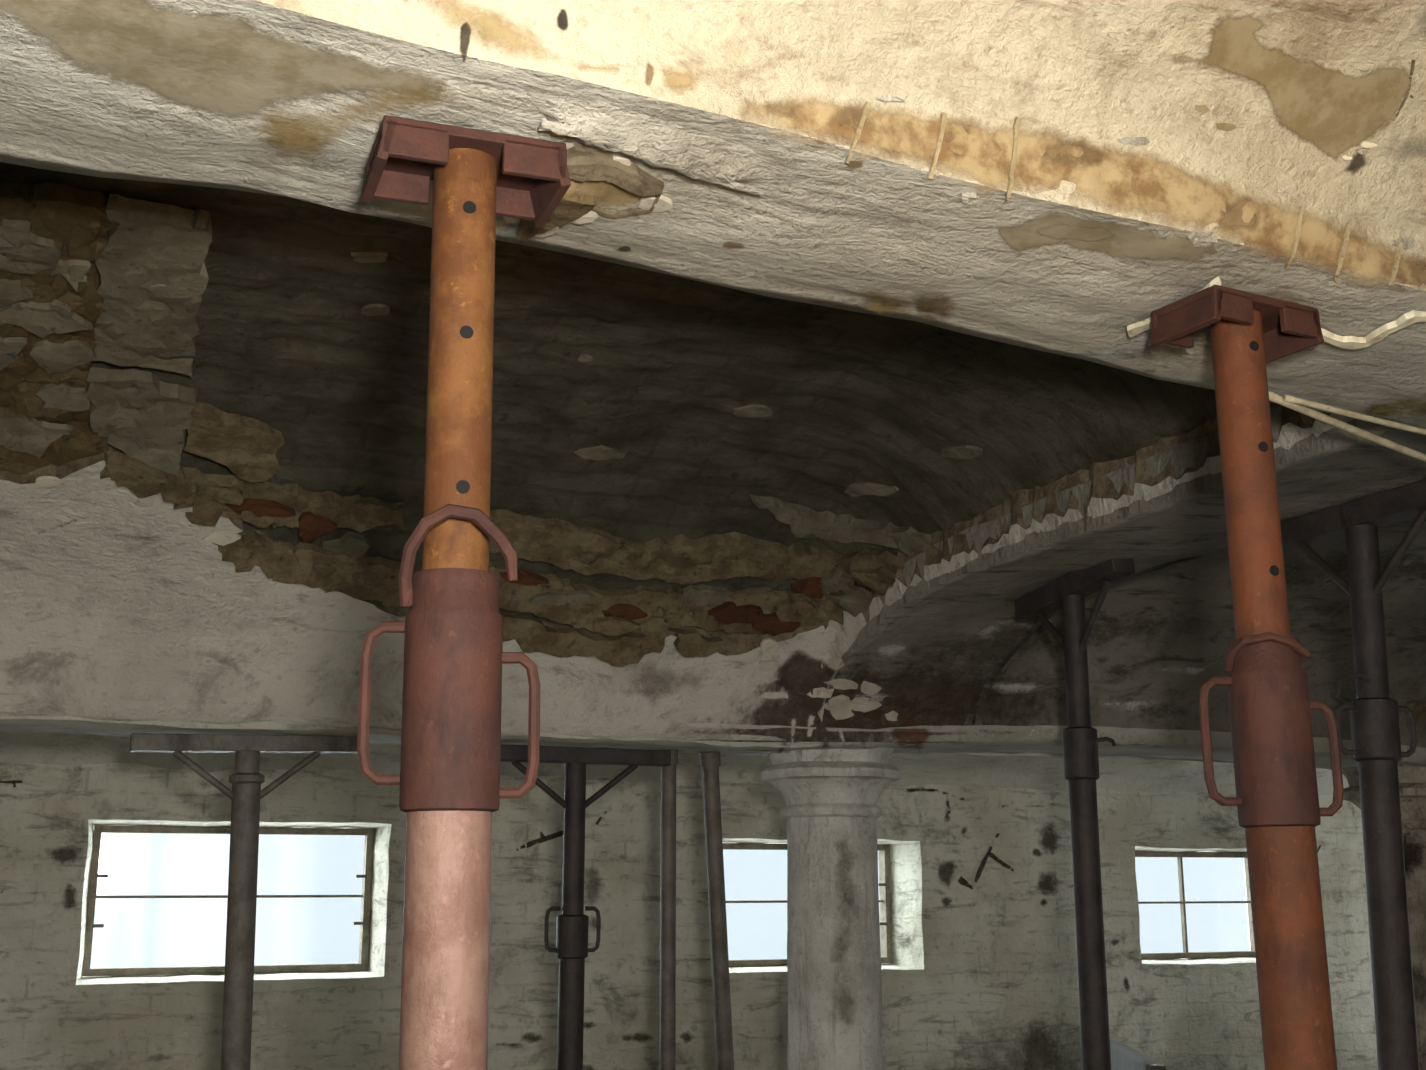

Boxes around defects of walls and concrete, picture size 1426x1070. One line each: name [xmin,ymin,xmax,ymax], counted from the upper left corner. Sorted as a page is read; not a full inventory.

water stain [269,115,332,149]
flaking render [745,94,1426,288]
peeling [1174,3,1411,173]
spalling [0,162,432,617]
spalling [489,145,1220,720]
spalling [1269,401,1332,443]
peeling [1321,310,1426,349]
water stain [983,1028,1077,1070]